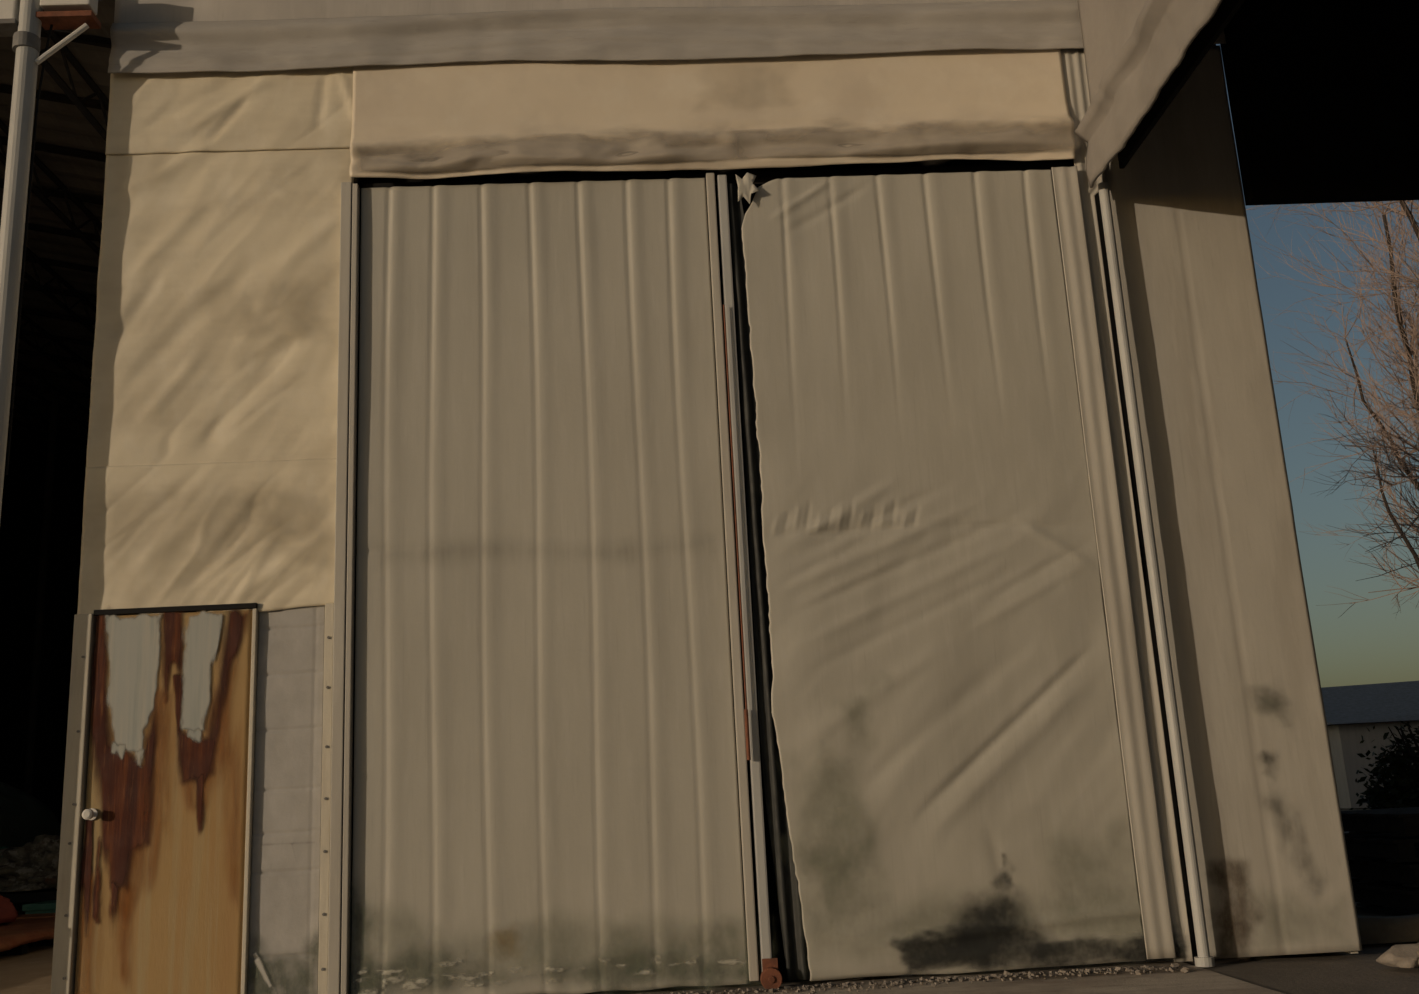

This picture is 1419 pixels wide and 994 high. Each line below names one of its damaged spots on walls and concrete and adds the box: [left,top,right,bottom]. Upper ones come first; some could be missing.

rust [162,609,246,833]
rust [80,615,156,930]
leakage [898,898,1149,980]
leakage [1169,935,1183,959]
leakage [1211,865,1249,956]